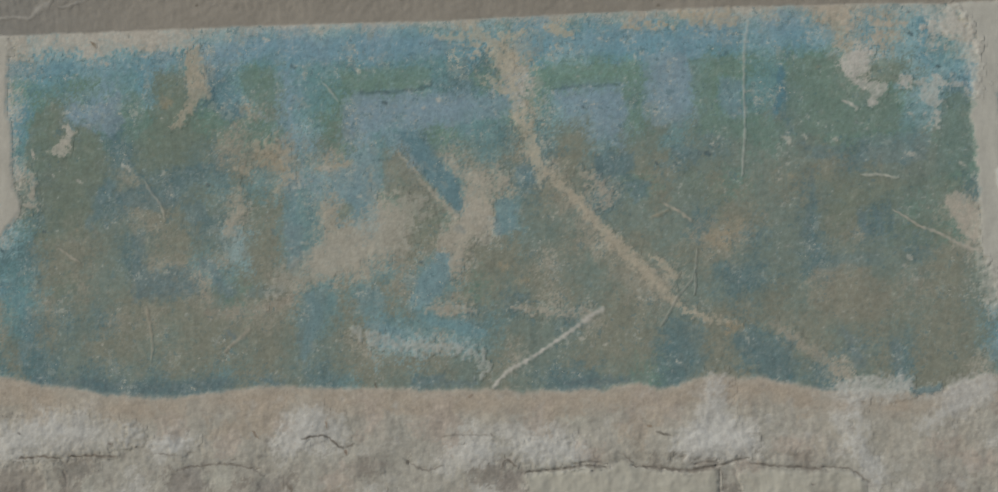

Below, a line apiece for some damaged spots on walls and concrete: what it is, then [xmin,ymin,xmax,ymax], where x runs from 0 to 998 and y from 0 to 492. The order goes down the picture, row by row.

crack [300,420,354,456]
crack [655,429,673,437]
flaking render [0,461,47,492]
crack [16,452,118,492]
crack [158,452,265,477]
flaking render [338,454,388,481]
crack [405,453,445,473]
crack [499,452,872,492]